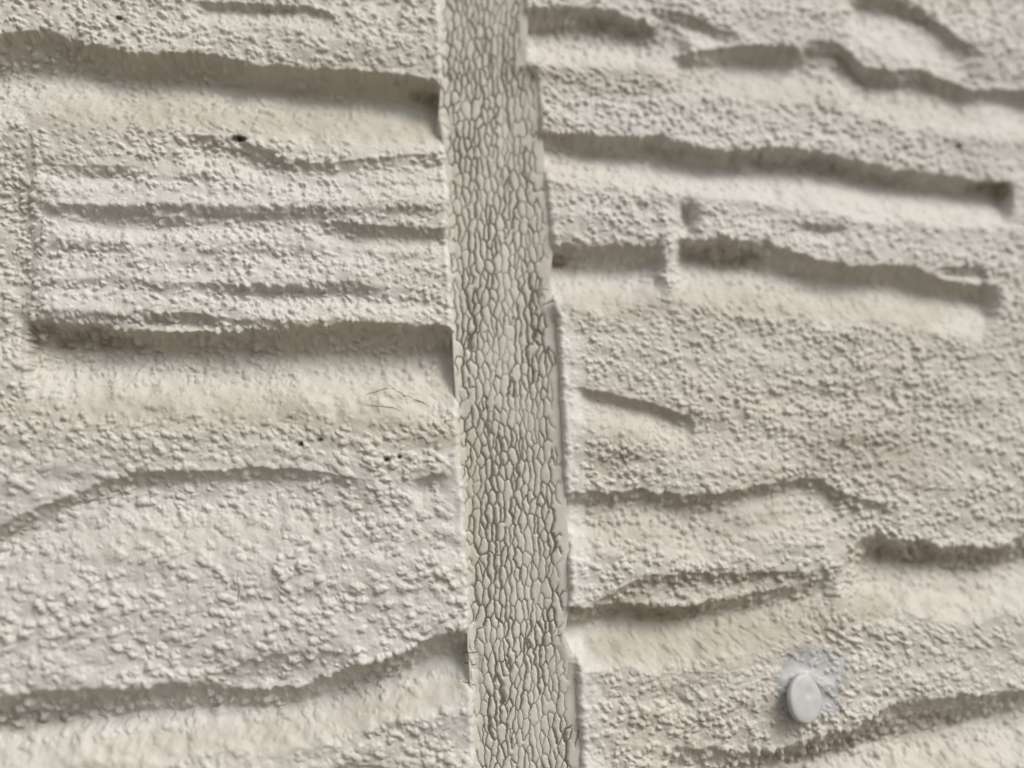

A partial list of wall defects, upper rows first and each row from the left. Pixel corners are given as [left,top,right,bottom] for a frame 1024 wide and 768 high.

crack [440,0,579,768]